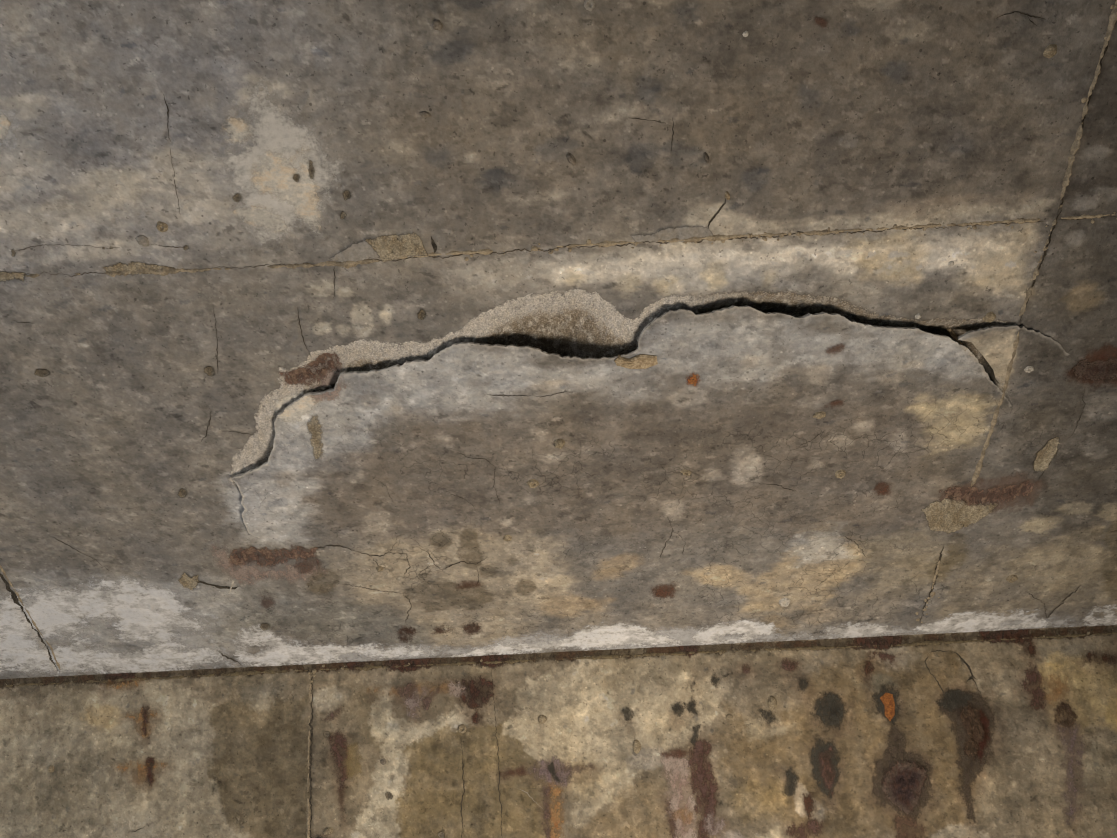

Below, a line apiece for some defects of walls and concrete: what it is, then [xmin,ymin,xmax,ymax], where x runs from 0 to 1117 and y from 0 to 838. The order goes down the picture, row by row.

crack [997,11,1044,26]
spalling [229,289,1070,548]
damp [0,576,801,676]
corrosion [854,635,903,674]
damp [826,609,1066,639]
crack [1029,587,1079,618]
damp [672,682,701,745]
corrosion [661,740,725,838]
corrosion [786,739,840,838]
damp [812,692,845,730]
corrosion [872,685,932,838]
corrosion [936,689,995,822]